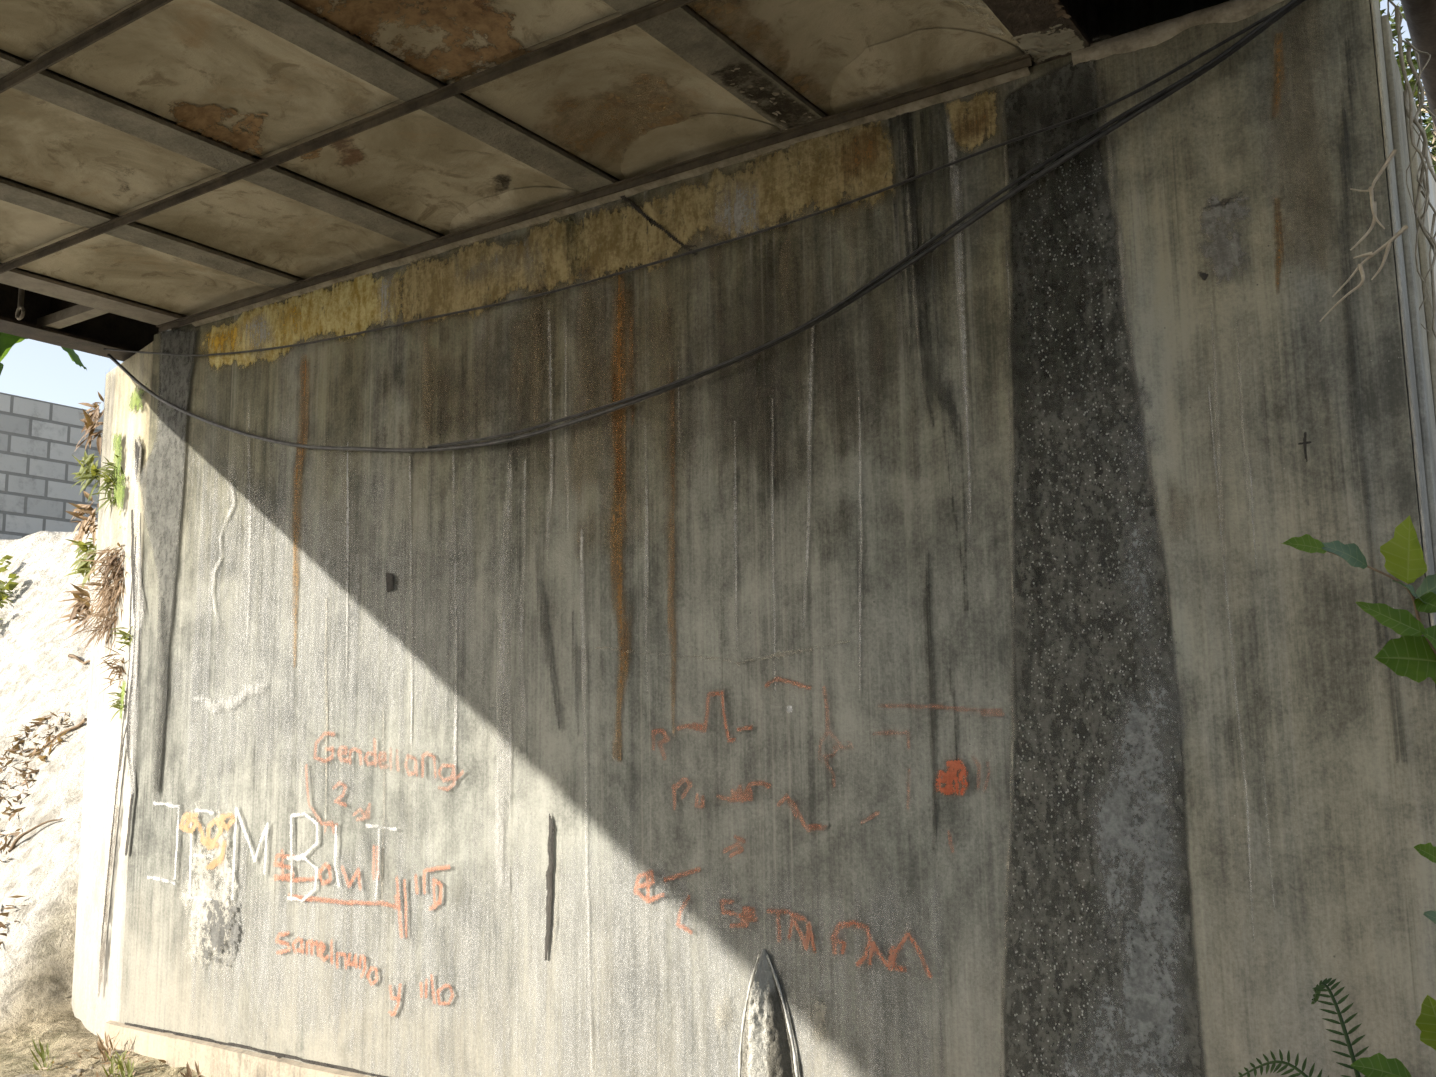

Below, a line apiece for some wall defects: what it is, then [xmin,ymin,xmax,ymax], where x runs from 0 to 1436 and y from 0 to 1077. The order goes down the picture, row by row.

crack [98,461,146,994]
crack [124,1022,388,1077]
rust [293,358,308,615]
crack [545,813,554,960]
rust [610,268,633,760]
water stain [124,0,1205,1077]